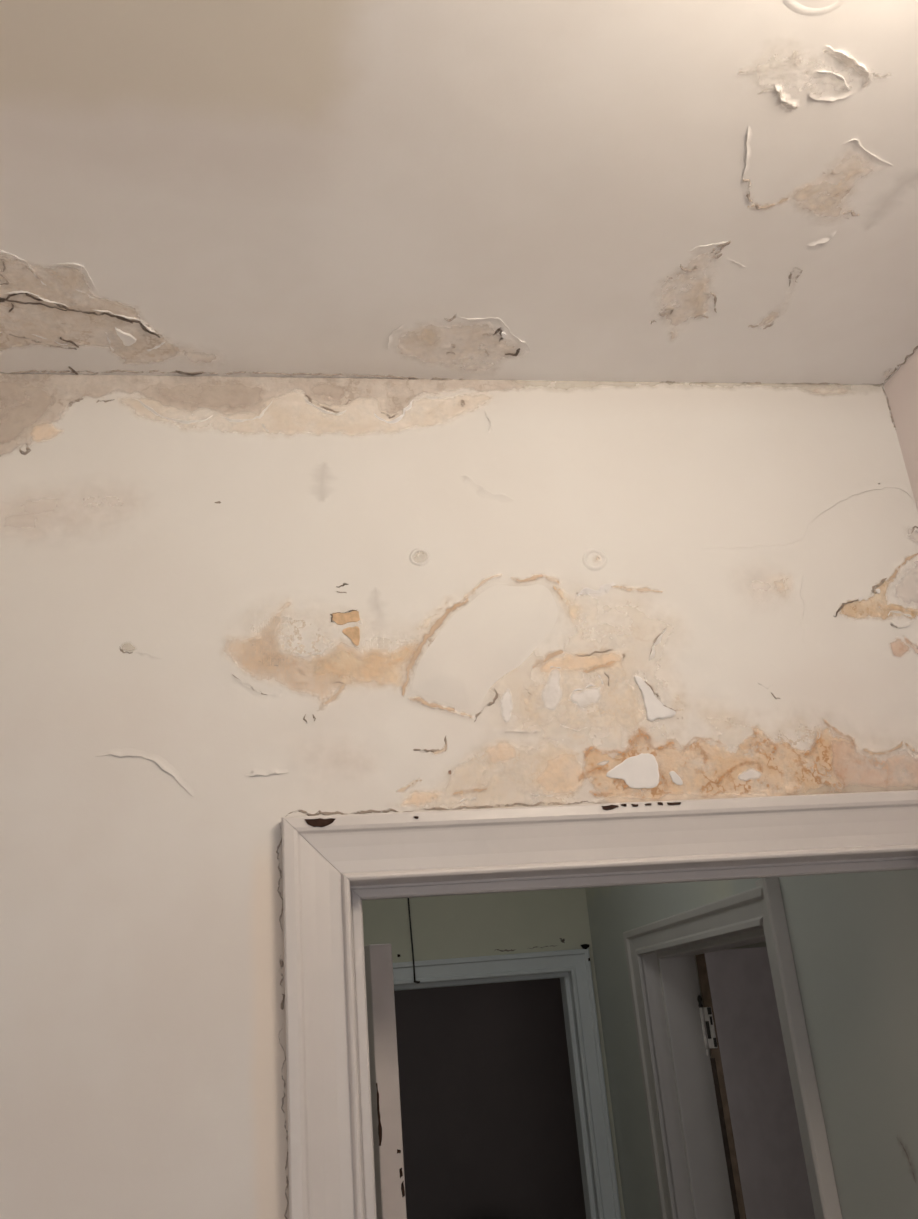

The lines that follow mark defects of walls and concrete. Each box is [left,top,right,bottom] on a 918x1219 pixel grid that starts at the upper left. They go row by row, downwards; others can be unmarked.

spalling [774,46,874,107]
peeling [743,126,784,210]
peeling [841,139,892,167]
peeling [0,251,531,455]
peeling [330,610,360,646]
peeling [502,649,676,734]
peeling [602,802,681,810]